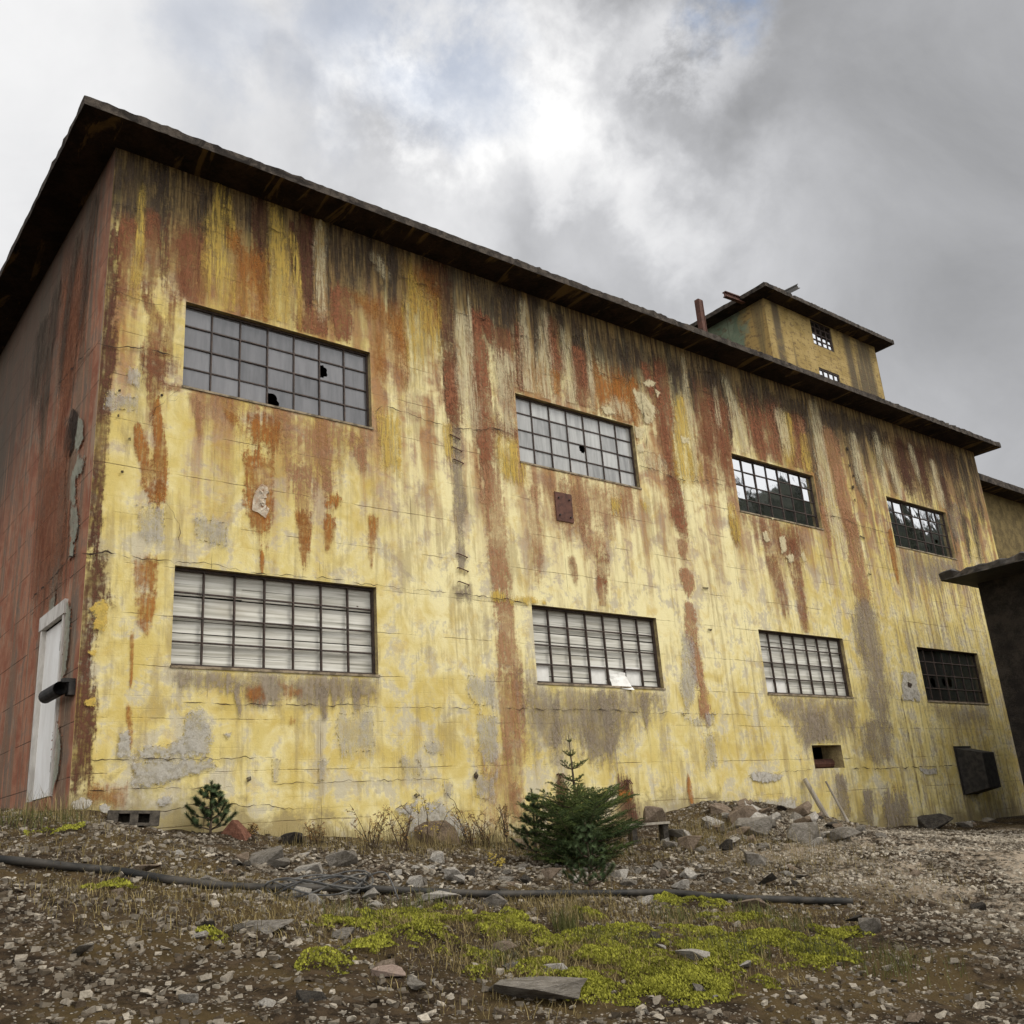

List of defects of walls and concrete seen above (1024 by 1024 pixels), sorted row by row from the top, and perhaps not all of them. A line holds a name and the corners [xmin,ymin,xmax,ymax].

rust [115,209,209,509]
peeling [48,409,87,679]
spalling [252,484,269,518]
rust [217,396,369,573]
rust [368,515,378,566]
rust [444,308,529,764]
leakage [70,149,985,795]
rust [529,472,545,582]
rust [543,315,711,725]
crack [74,754,271,762]
peeling [117,708,231,807]